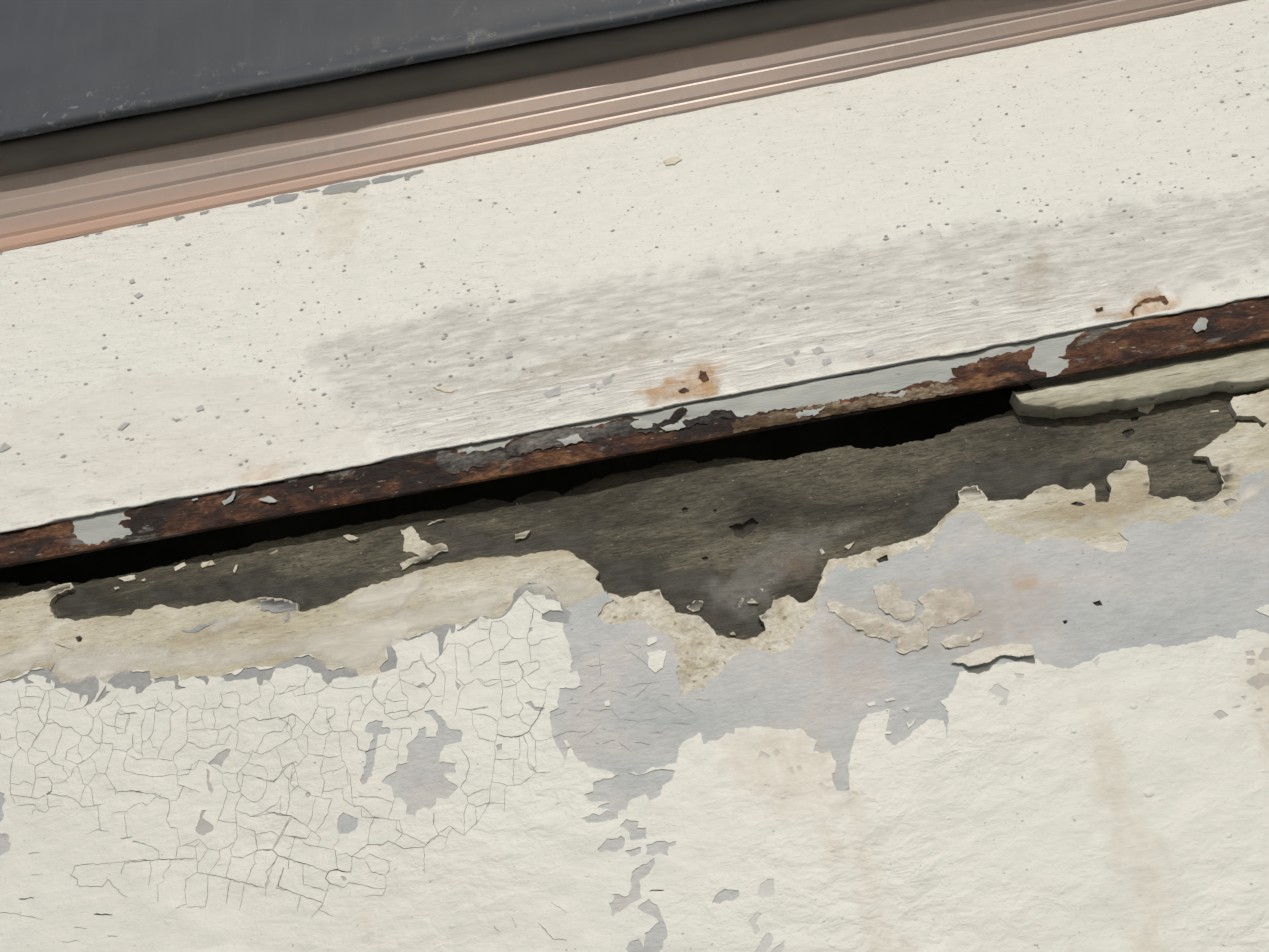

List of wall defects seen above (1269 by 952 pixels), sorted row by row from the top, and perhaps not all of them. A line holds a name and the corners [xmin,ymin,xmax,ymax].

flaking render [1017,340,1269,392]
corrosion [0,296,1269,566]
damp [906,457,1133,533]
damp [1157,475,1230,499]
damp [52,566,371,615]
damp [418,521,799,636]
peeling [0,388,1269,952]
crack [0,597,697,942]